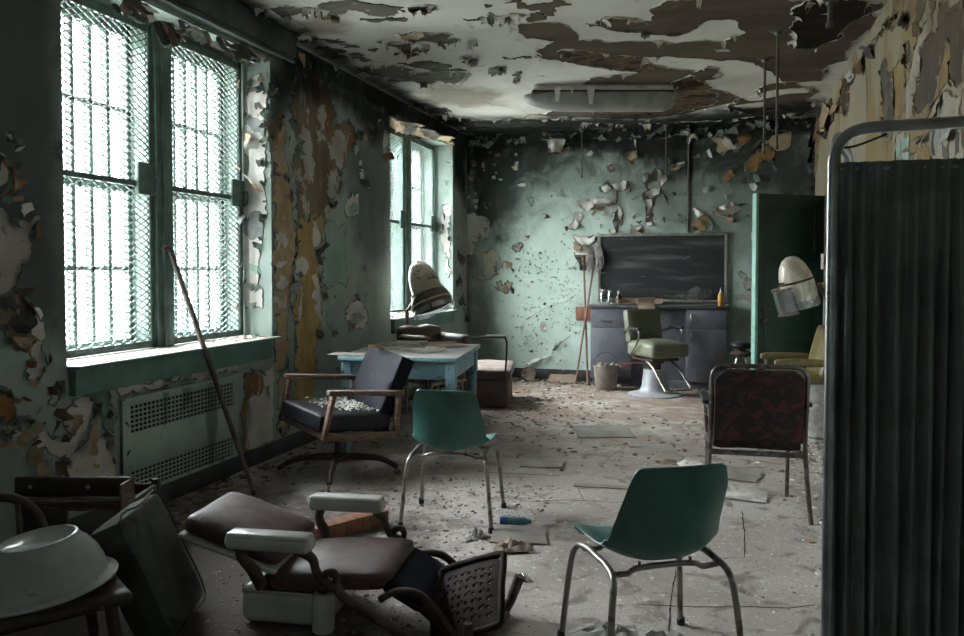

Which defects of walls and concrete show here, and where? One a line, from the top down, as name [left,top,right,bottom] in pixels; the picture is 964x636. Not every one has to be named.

peeling [0,207,239,477]
water stain [235,0,822,240]
spalling [111,0,964,438]